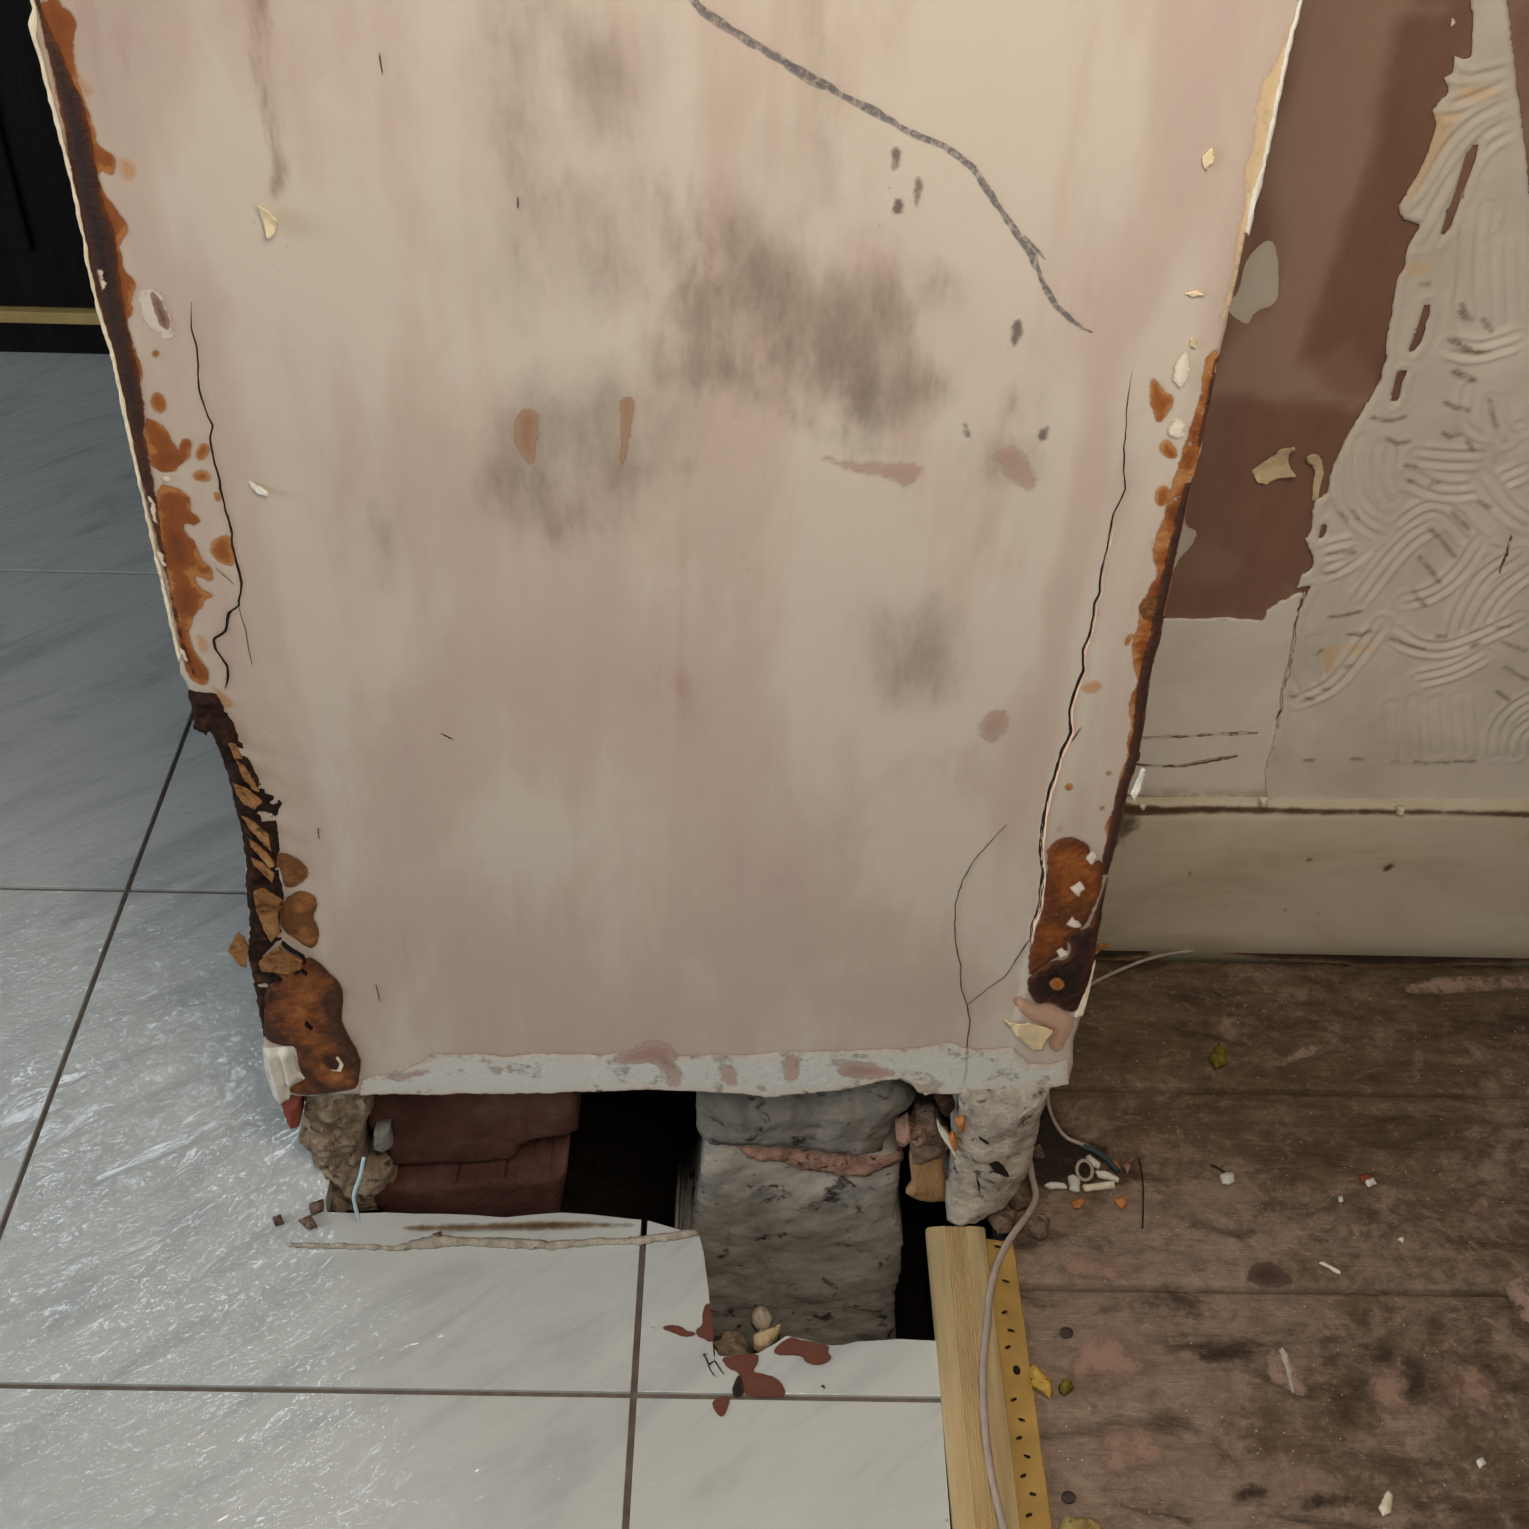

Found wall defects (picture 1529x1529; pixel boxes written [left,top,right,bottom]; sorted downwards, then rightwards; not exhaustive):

peeling [1222,0,1303,324]
corrosion [36,0,234,705]
crack [190,302,252,689]
corrosion [228,743,361,1095]
spalling [514,409,538,464]
spalling [620,397,635,462]
crack [954,374,1132,1081]
flaking render [1070,881,1085,897]
corrosion [1027,350,1220,1012]
peeling [1174,516,1197,568]
peeling [1252,447,1324,501]
spalling [281,960,1096,1417]